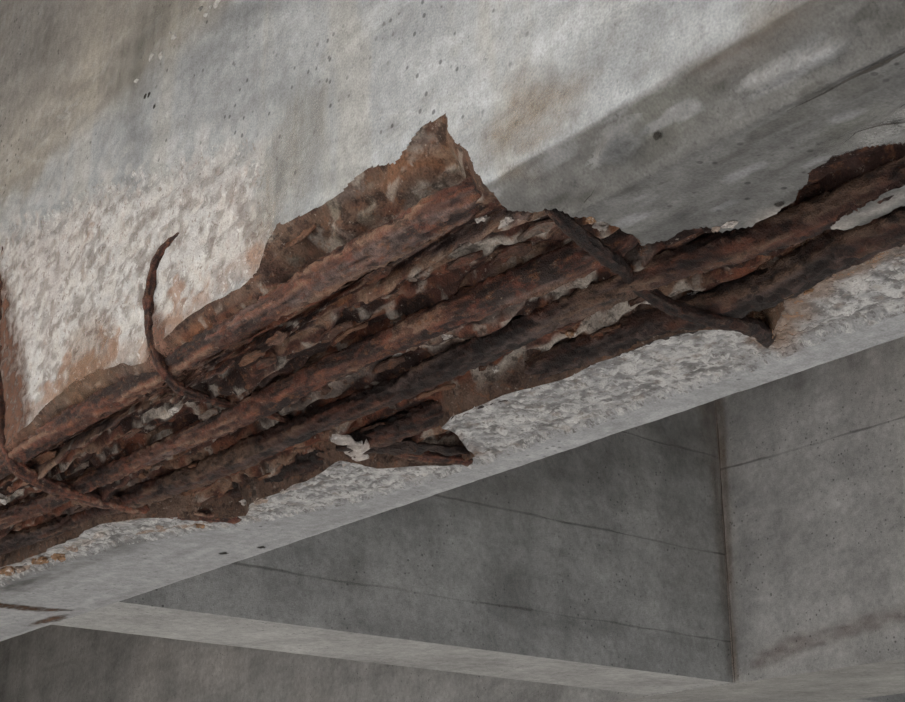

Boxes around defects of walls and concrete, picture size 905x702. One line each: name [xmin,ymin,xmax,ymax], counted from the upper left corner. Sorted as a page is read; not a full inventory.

crack [844,104,905,143]
spalling [0,113,572,510]
rust [0,156,905,555]
spalling [0,244,905,587]
spalling [574,217,619,239]
spalling [622,220,738,272]
spalling [657,142,905,300]
rust [0,603,73,625]